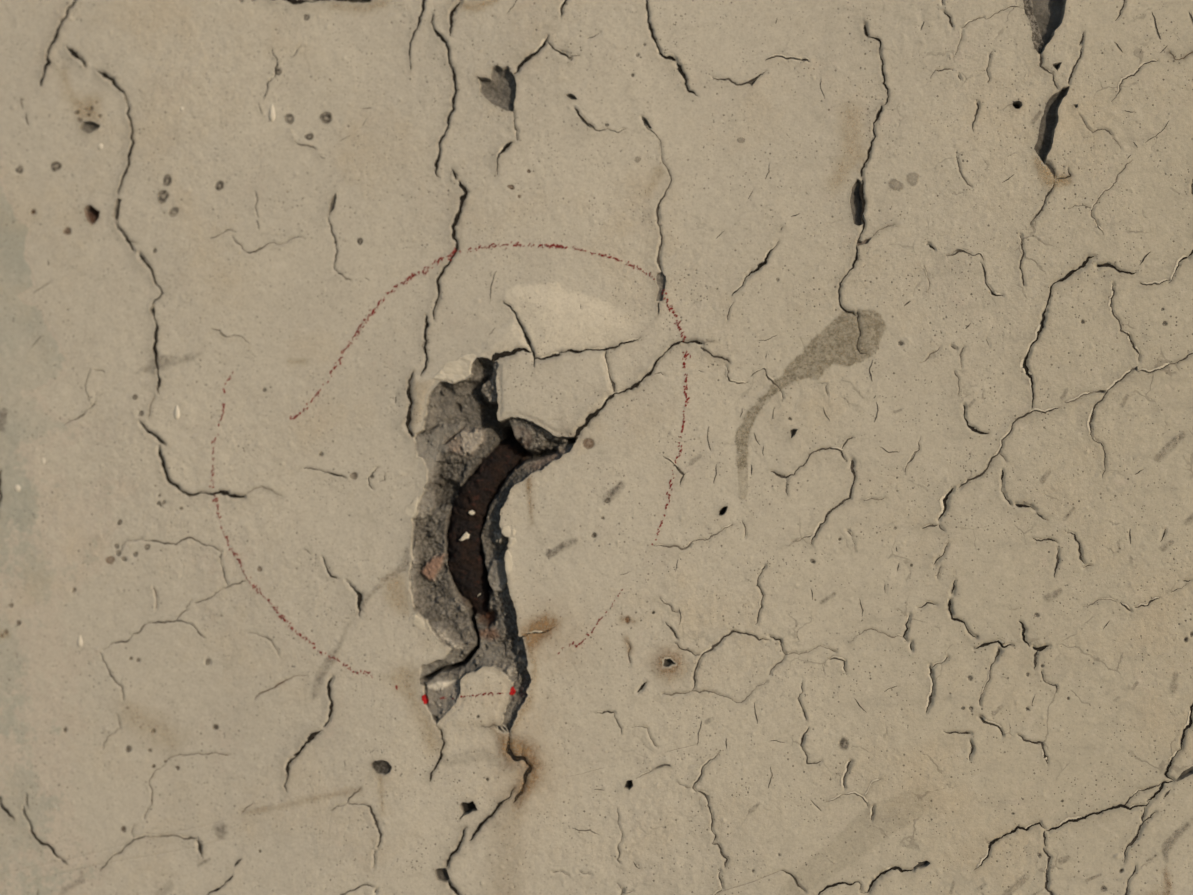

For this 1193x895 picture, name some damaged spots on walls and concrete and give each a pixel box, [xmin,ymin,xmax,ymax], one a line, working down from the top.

crack [117,224,281,498]
crack [406,0,468,437]
spalling [477,65,517,112]
crack [491,302,783,437]
peeling [655,272,666,317]
spalling [850,179,864,226]
crack [838,25,892,354]
spalling [1023,0,1066,54]
spalling [1034,86,1078,165]
spalling [405,354,594,733]
crack [628,117,1193,820]
crack [976,704,1193,895]